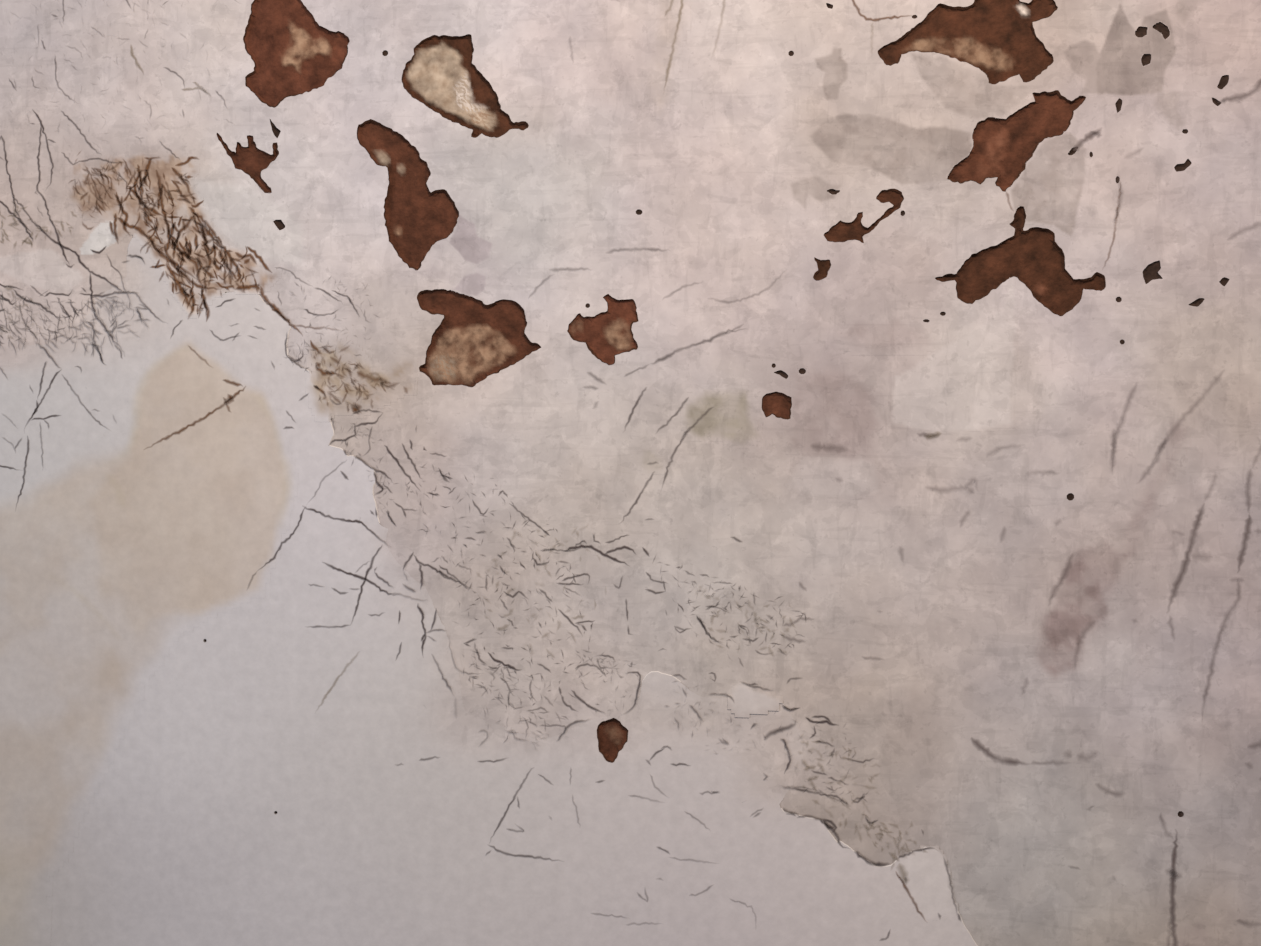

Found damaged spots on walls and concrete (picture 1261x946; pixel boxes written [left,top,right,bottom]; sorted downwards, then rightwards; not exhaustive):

crack [0,113,175,498]
corrosion [66,148,291,324]
crack [163,380,243,439]
crack [265,289,357,389]
water stain [0,335,298,946]
peeling [0,222,978,946]
crack [268,410,779,739]
crack [495,799,533,857]
crack [752,706,928,915]